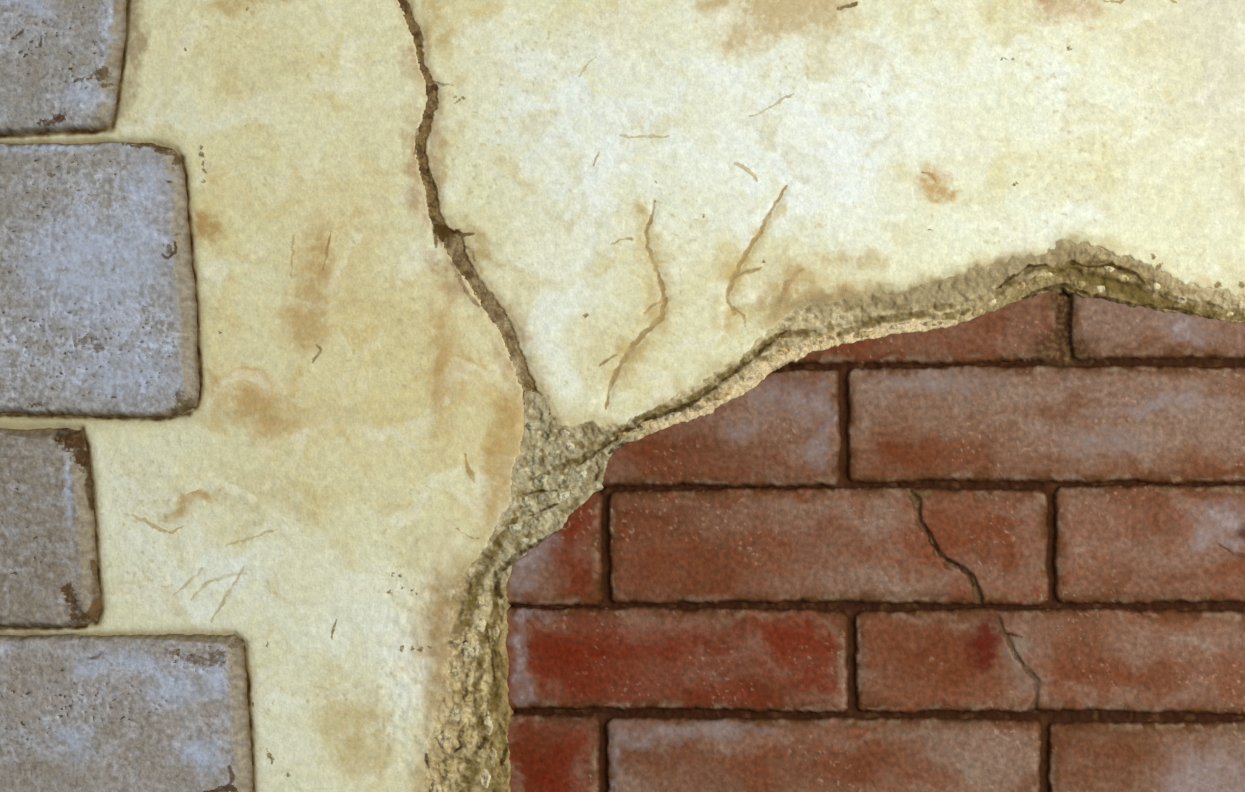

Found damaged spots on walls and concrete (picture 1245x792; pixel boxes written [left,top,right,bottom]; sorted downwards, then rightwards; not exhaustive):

crack [398,0,556,420]
crack [600,200,668,410]
crack [727,185,788,318]
spalling [400,239,1245,792]
crack [907,490,1038,721]